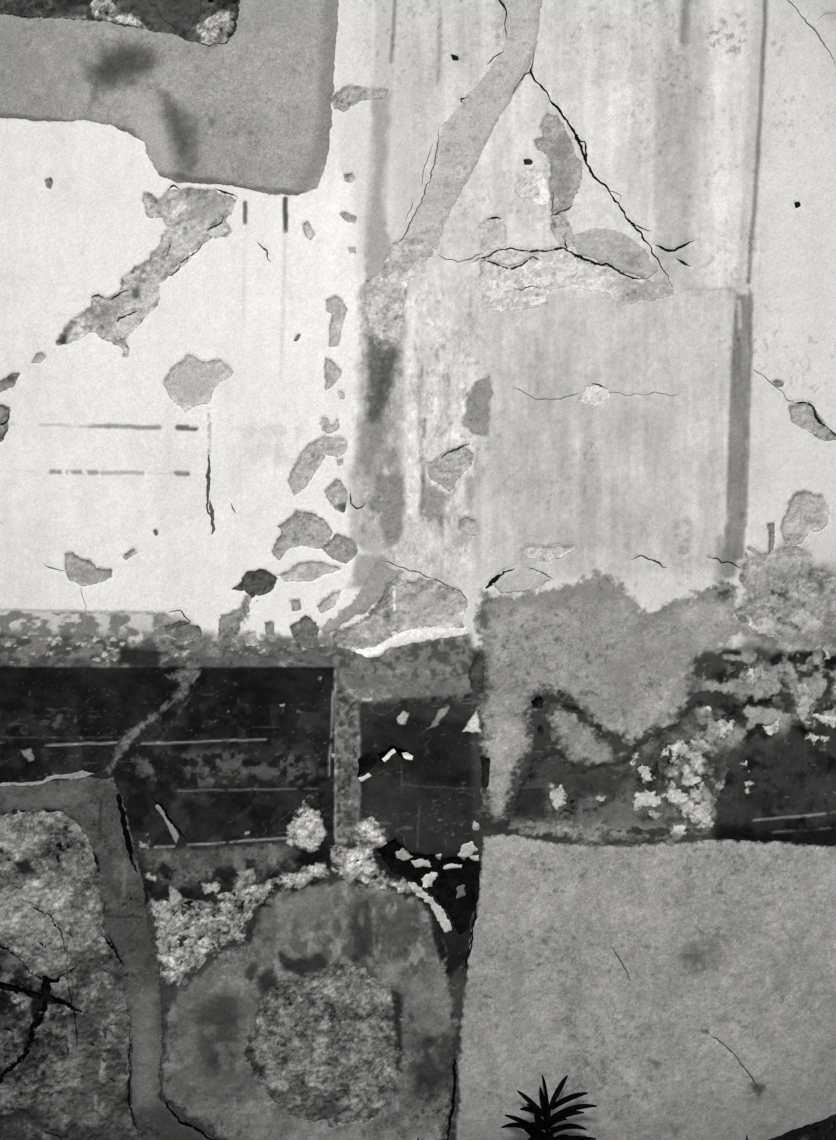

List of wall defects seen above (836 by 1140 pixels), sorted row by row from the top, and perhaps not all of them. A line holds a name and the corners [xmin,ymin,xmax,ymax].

crack [486,0,507,65]
crack [787,0,835,66]
spalling [56,185,237,358]
crack [438,54,695,291]
spalling [477,112,674,313]
crack [206,454,236,535]
spalling [217,510,358,648]
water stain [355,556,386,586]
water stain [364,336,404,543]
peeling [505,490,836,838]
spalling [139,800,480,986]
crack [0,905,137,1129]